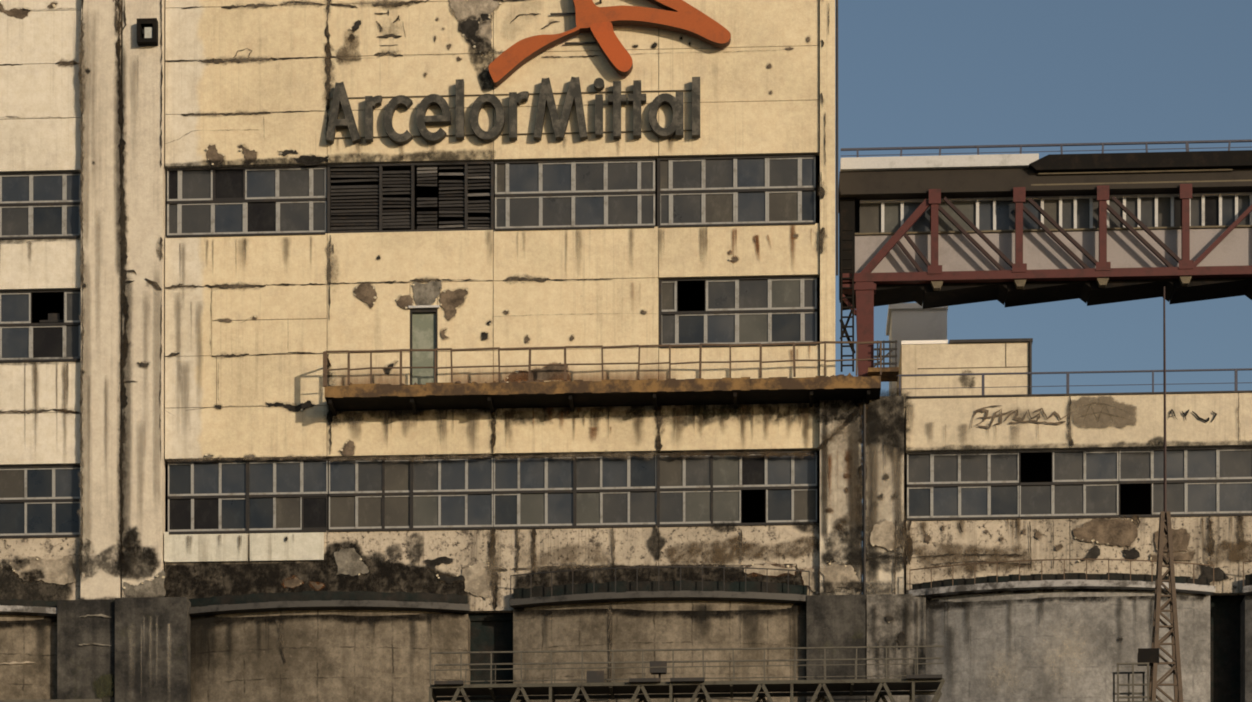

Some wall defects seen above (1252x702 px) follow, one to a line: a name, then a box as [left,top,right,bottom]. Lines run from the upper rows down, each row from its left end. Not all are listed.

spalling [434,0,504,61]
spalling [354,283,378,308]
spalling [396,280,469,339]
leakage [15,357,81,420]
leakage [440,409,477,439]
leakage [2,556,44,581]
leakage [72,527,159,579]
spalling [424,556,491,598]
leakage [817,419,903,624]
spalling [1055,518,1229,582]
leakage [877,601,932,678]